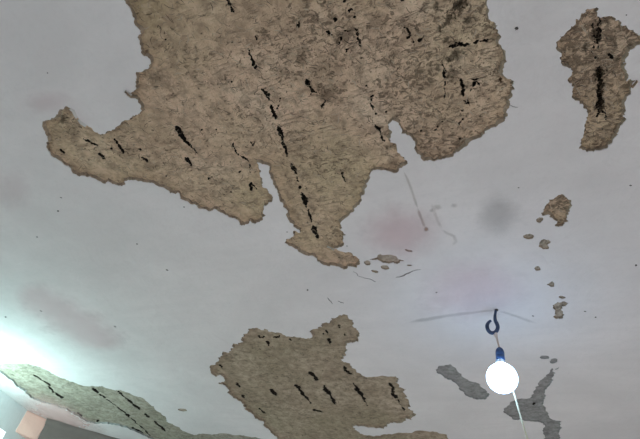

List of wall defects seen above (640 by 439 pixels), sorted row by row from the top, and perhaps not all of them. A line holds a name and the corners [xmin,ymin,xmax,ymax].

crack [449,38,488,49]
spalling [556,7,640,152]
crack [175,126,198,166]
spalling [42,0,514,273]
crack [261,89,319,239]
spalling [536,194,572,227]
spalling [553,296,568,319]
crack [33,375,64,399]
crack [92,388,165,436]
spalling [0,363,260,439]
crack [294,371,336,412]
spalling [210,314,448,439]